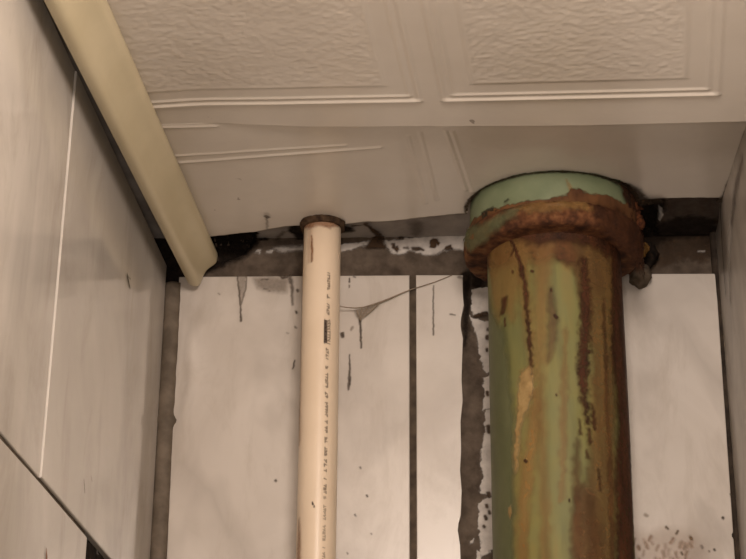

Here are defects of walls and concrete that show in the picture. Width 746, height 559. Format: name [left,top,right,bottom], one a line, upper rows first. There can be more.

corrosion [469,181,645,230]
water stain [154,238,185,282]
water stain [288,226,304,240]
water stain [343,223,453,252]
water stain [461,272,488,346]
corrosion [487,232,640,559]